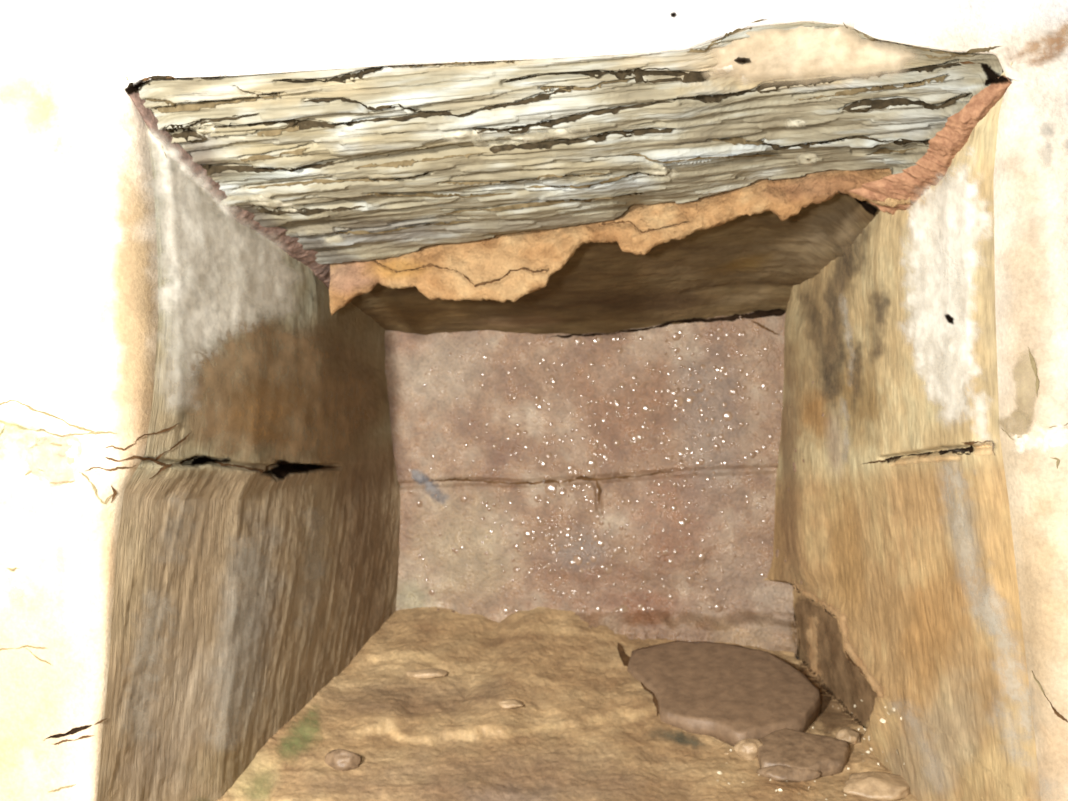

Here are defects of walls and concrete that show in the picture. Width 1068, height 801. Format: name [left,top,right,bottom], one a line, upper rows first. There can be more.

crack [843,23,999,64]
crack [0,400,342,504]
crack [863,440,995,466]
spalling [790,583,883,733]
crack [1032,671,1068,722]
crack [44,718,107,745]